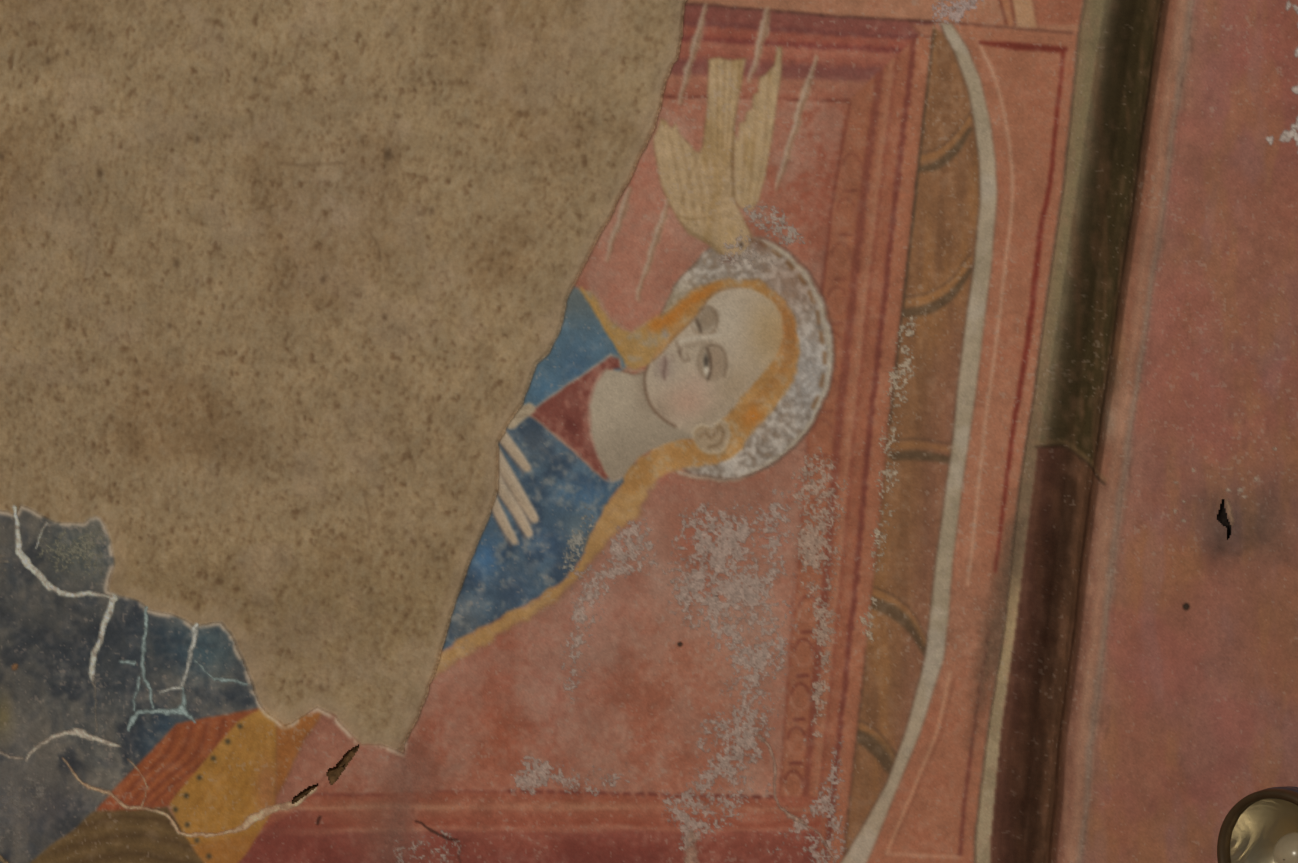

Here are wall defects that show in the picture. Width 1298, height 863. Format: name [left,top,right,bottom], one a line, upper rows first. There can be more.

peeling [1266,117,1298,145]
crack [0,506,317,837]
flaking render [0,0,687,804]
spalling [1217,488,1246,538]